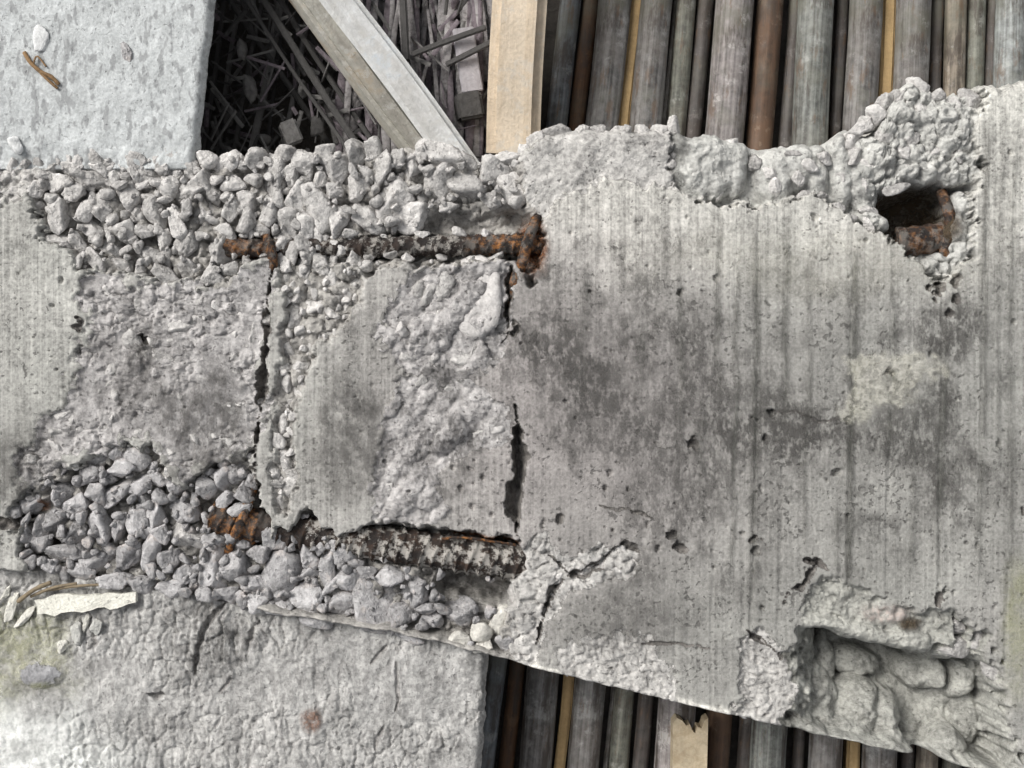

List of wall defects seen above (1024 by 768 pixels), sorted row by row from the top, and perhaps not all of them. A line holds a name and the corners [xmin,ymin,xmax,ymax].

rust [520,225,547,270]
rust [876,189,960,240]
crack [252,269,273,508]
spalling [0,76,985,666]
crack [503,403,531,544]
crack [535,539,640,645]
spalling [730,577,1024,768]